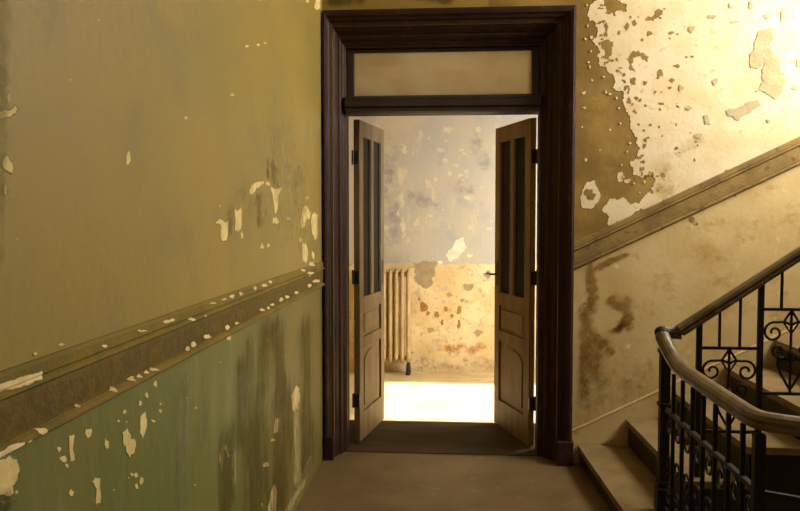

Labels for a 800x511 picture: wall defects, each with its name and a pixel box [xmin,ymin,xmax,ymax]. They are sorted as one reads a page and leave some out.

peeling [579,0,800,226]
peeling [249,181,290,224]
peeling [215,208,243,242]
peeling [438,225,473,264]
spalling [418,283,473,333]
peeling [0,371,43,392]
peeling [117,392,162,458]
damp [263,319,313,511]
peeling [291,385,300,413]
spalling [0,440,33,505]
peeling [57,435,75,468]
peeling [91,478,101,505]